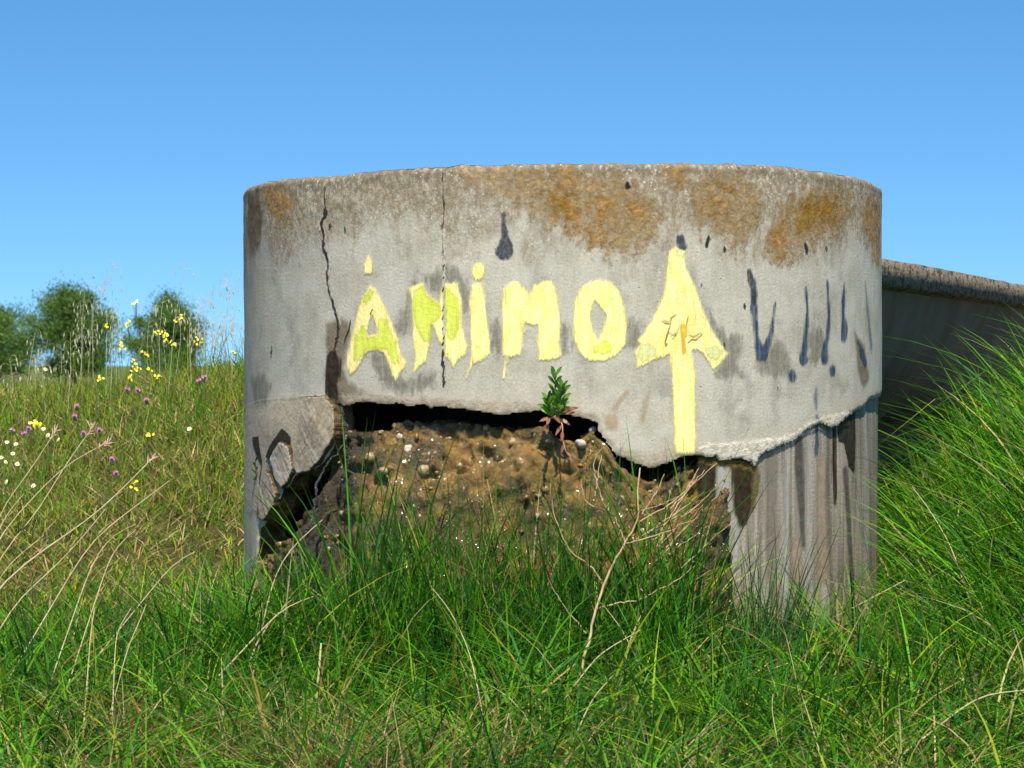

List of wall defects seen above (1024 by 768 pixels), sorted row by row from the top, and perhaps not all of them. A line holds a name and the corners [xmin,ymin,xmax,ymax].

crack [293,188,351,398]
crack [440,176,448,386]
spalling [238,393,857,643]
leakage [697,458,754,572]
leakage [767,412,867,633]